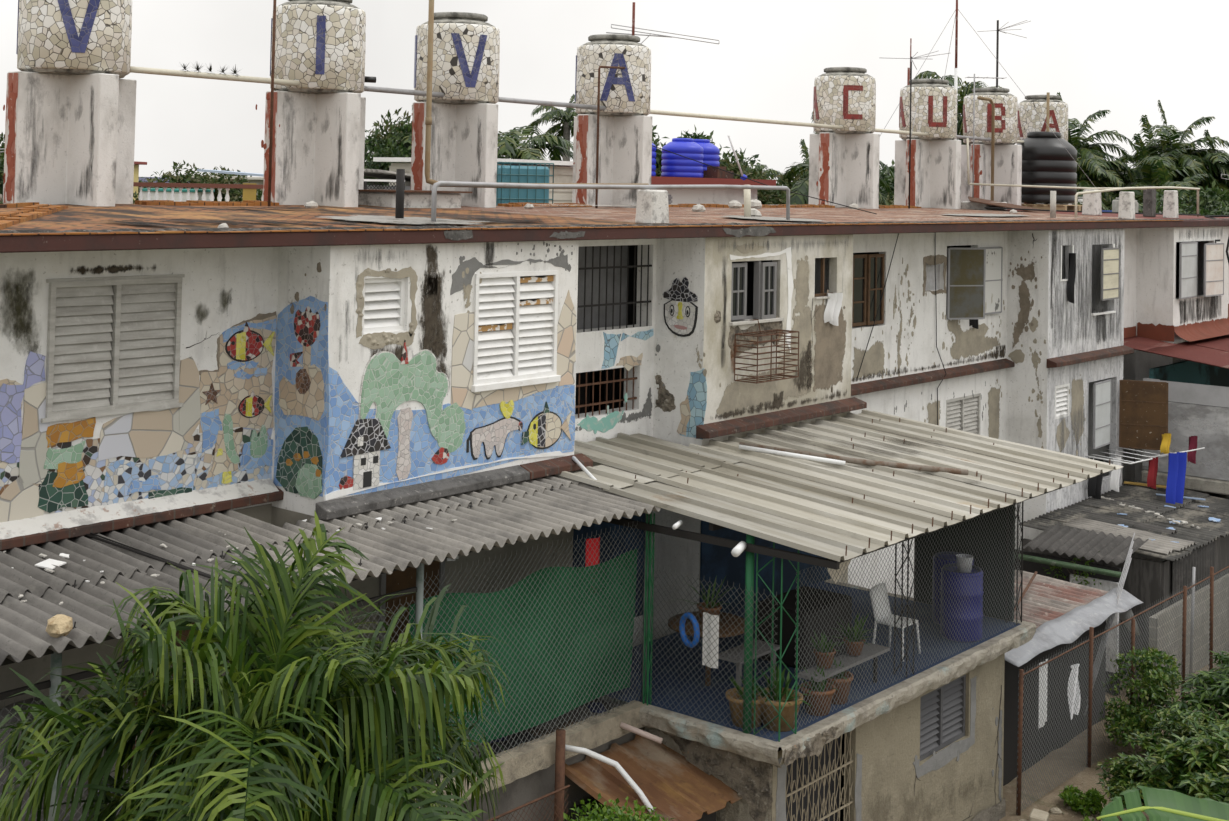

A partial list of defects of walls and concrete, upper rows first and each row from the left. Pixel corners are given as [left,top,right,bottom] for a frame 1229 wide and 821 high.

spalling [723,225,776,254]
leakage [2,273,35,352]
leakage [371,244,447,374]
peeling [714,254,947,417]
peeling [921,251,1086,456]